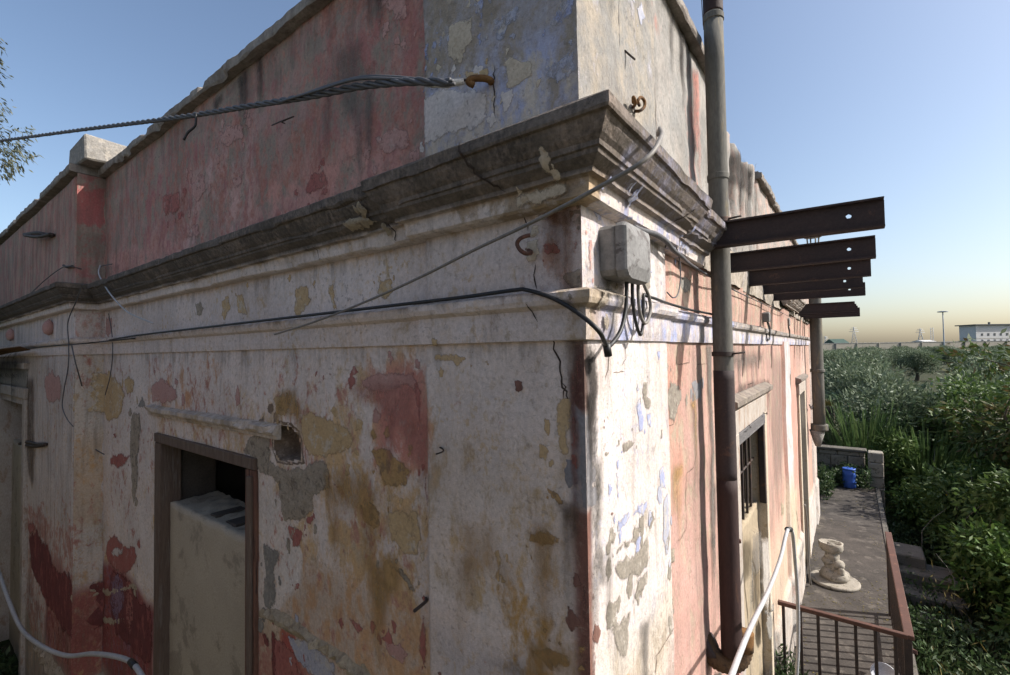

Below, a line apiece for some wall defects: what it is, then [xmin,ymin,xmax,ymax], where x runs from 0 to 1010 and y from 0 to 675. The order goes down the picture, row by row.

peeling [420,0,541,153]
water stain [728,153,753,196]
peeling [88,368,185,506]
peeling [348,366,358,389]
water stain [569,347,598,483]
peeling [539,376,651,509]
flaking render [658,351,704,422]
peeling [28,523,72,638]
peeling [87,536,152,673]
flaking render [243,392,428,675]
peeling [526,532,558,560]
flaking render [531,467,675,675]